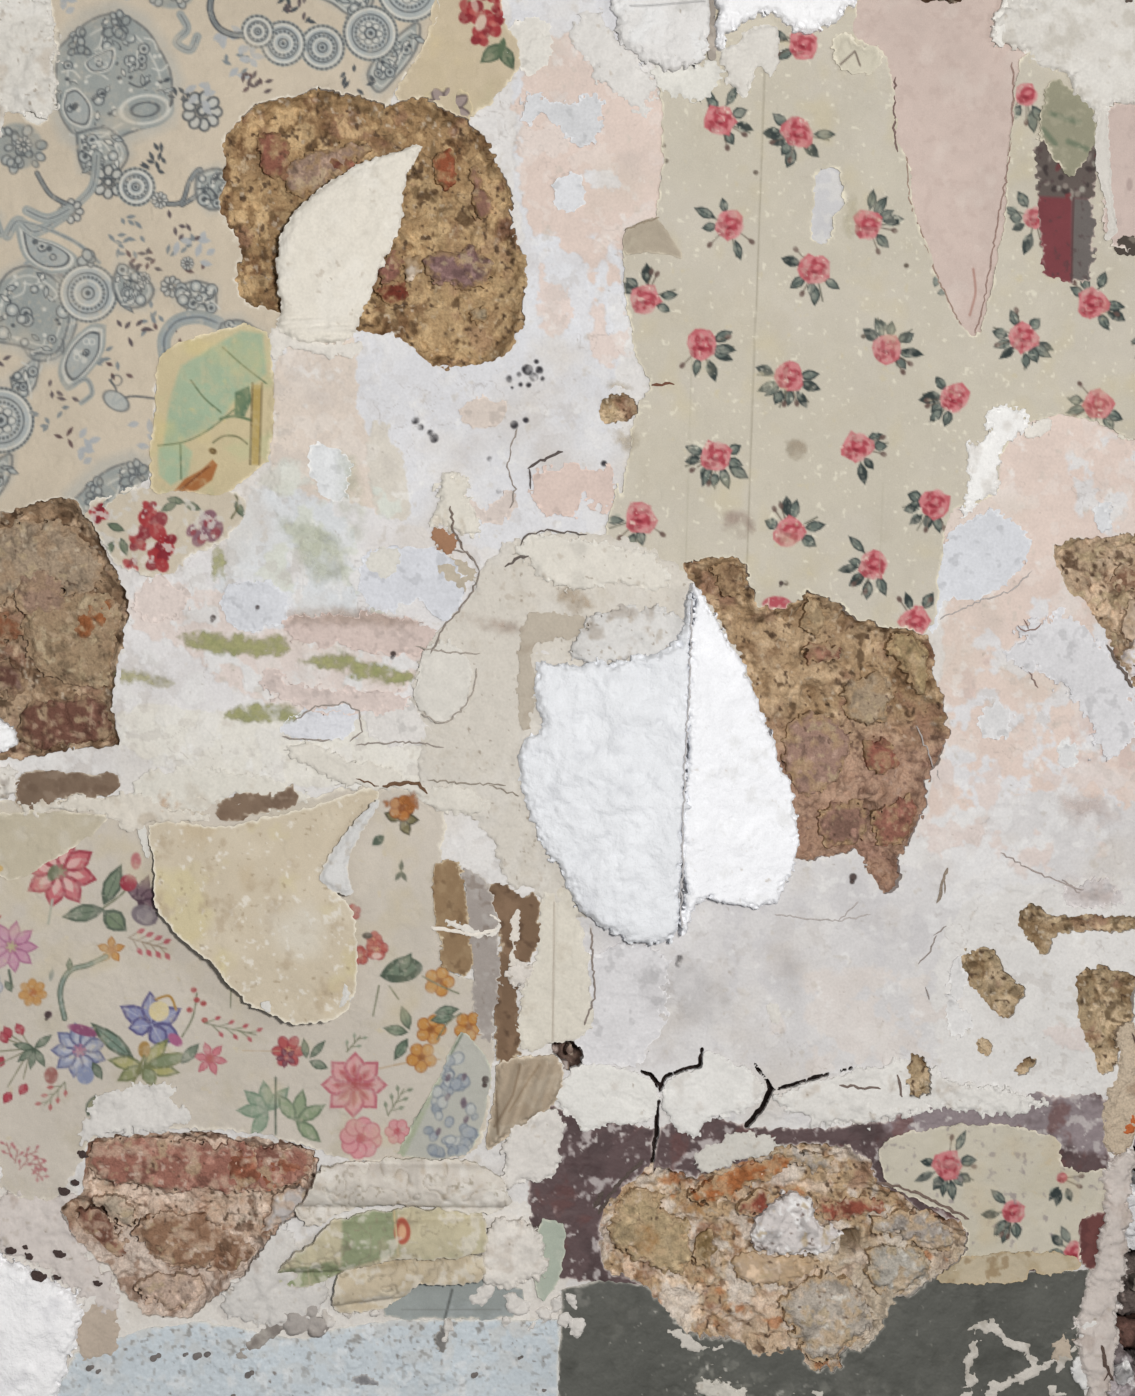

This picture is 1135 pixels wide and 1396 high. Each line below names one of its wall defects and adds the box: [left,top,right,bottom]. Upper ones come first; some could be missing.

spalling [219,88,528,371]
spalling [0,497,130,761]
spalling [683,507,1032,893]
peeling [1003,502,1135,768]
spalling [6,1245,61,1282]
spalling [53,1130,319,1318]
peeling [551,942,672,1070]
crack [593,1047,703,1214]
crack [744,1064,903,1128]
spalling [526,964,1135,1396]
spalling [945,946,1024,1018]
spalling [1018,877,1135,955]